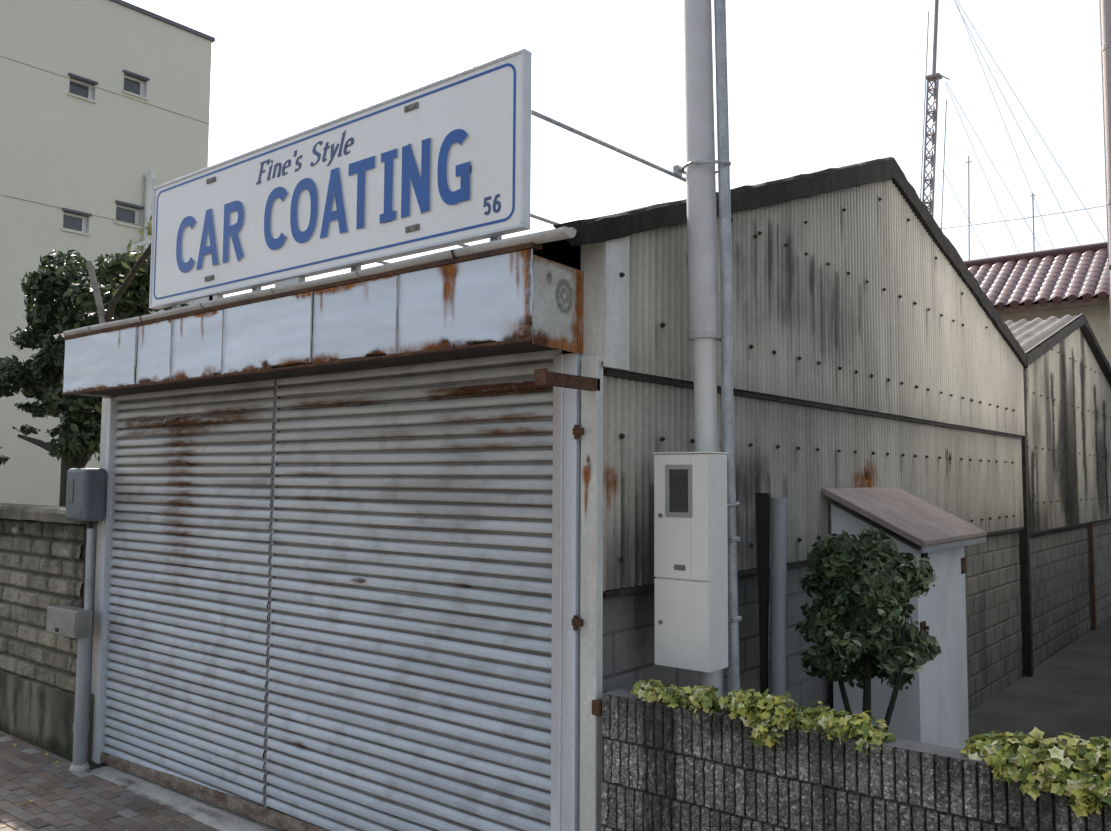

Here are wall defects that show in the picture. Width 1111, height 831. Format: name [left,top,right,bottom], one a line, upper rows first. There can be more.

water stain [755,224,791,286]
corrosion [292,276,392,306]
corrosion [440,264,457,302]
corrosion [506,249,584,354]
corrosion [404,340,476,353]
corrosion [139,372,188,383]
corrosion [236,357,337,372]
corrosion [430,381,552,400]
corrosion [485,414,533,448]
water stain [1051,354,1108,509]
corrosion [126,408,247,536]
corrosion [855,469,874,488]